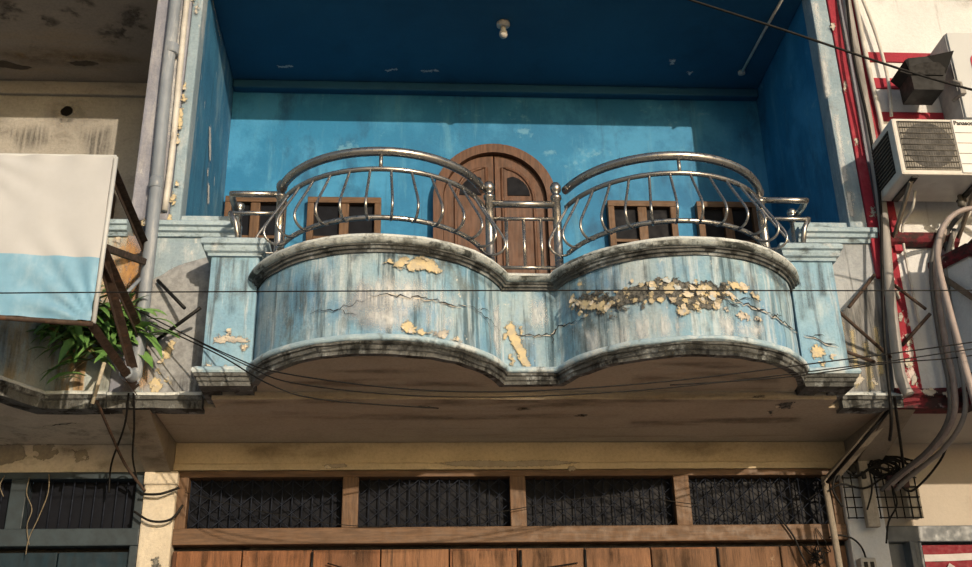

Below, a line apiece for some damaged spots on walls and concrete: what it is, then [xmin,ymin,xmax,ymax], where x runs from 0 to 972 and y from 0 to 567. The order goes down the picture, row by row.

peeling [382,255,443,274]
peeling [143,257,250,392]
spalling [401,320,463,343]
crack [315,293,585,343]
peeling [503,321,531,367]
spalling [568,277,762,323]
crack [717,297,838,348]
peeling [810,279,947,397]